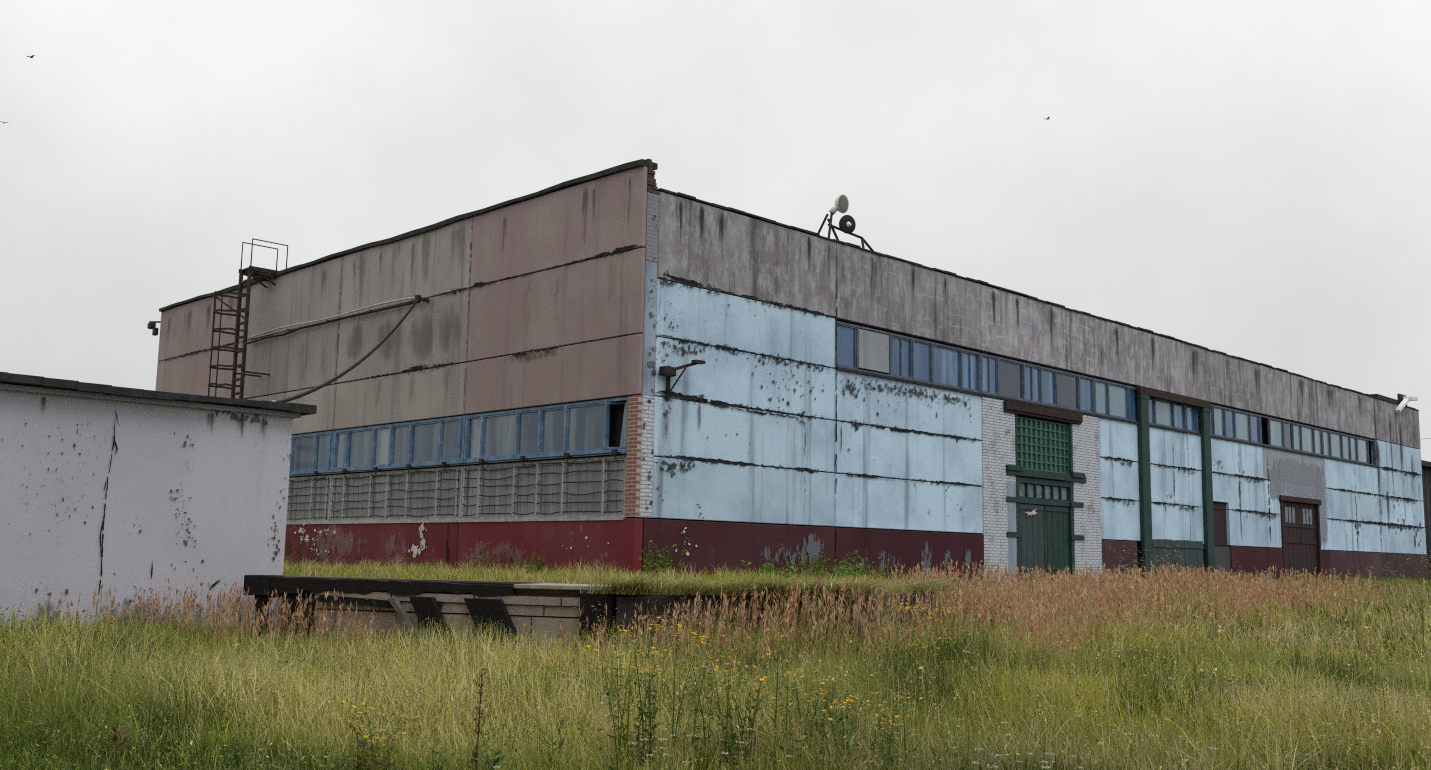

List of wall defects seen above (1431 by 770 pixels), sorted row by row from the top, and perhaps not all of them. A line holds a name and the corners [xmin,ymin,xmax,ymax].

water stain [700,207,724,240]
peeling [747,353,824,405]
crack [96,402,119,615]
peeling [267,478,360,561]
peeling [386,521,427,562]